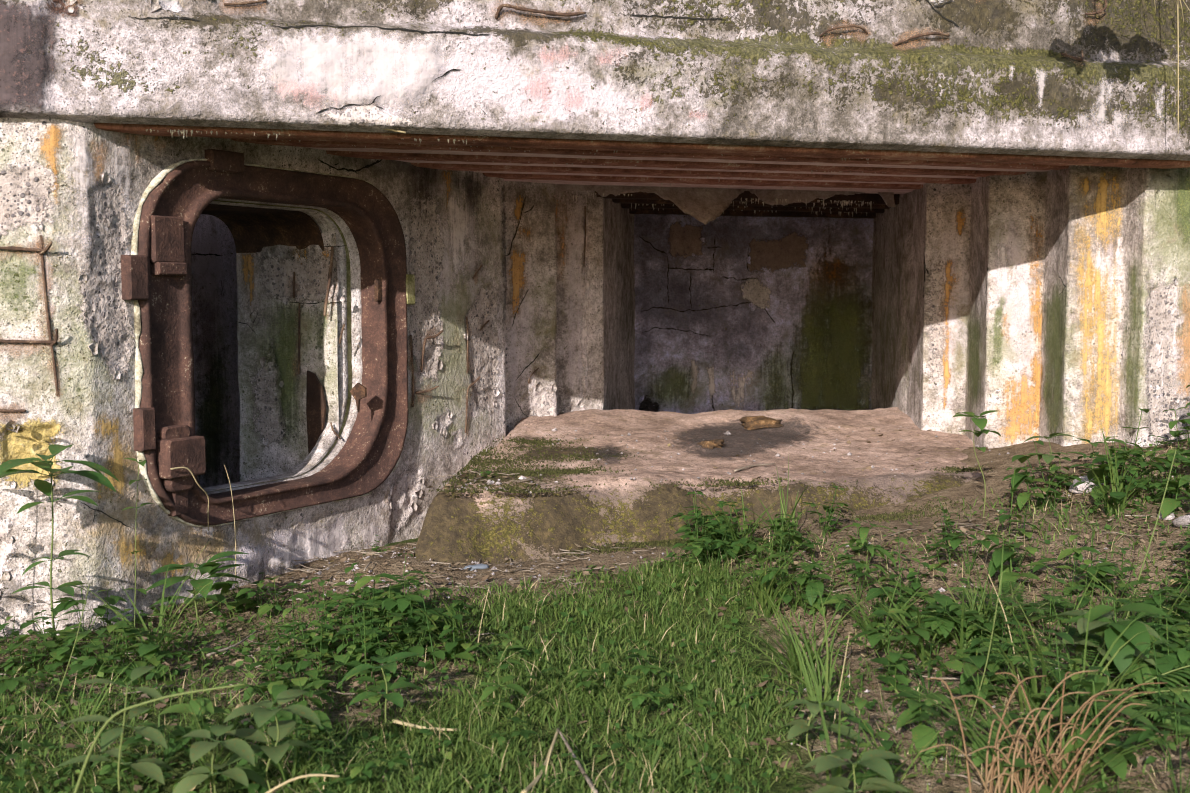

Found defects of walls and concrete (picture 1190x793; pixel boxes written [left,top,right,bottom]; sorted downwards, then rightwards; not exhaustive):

crack [128,14,203,22]
crack [272,25,490,36]
flaking render [554,184,896,225]
damp [1175,170,1190,238]
crack [640,237,775,336]
corrosion [1077,173,1121,437]
damp [649,360,715,405]
damp [673,294,871,460]